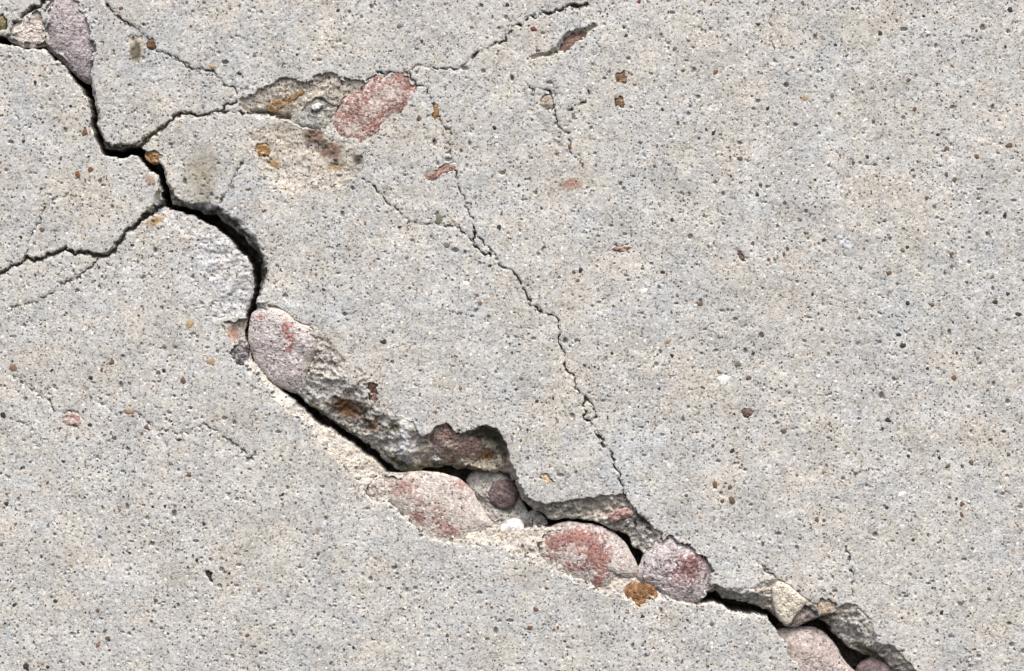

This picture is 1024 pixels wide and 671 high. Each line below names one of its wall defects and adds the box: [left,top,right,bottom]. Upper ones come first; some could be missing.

spalling [239,72,369,196]
crack [0,0,645,581]
spalling [155,207,664,608]
crack [661,590,892,670]
spalling [704,578,916,671]
crack [845,540,855,597]